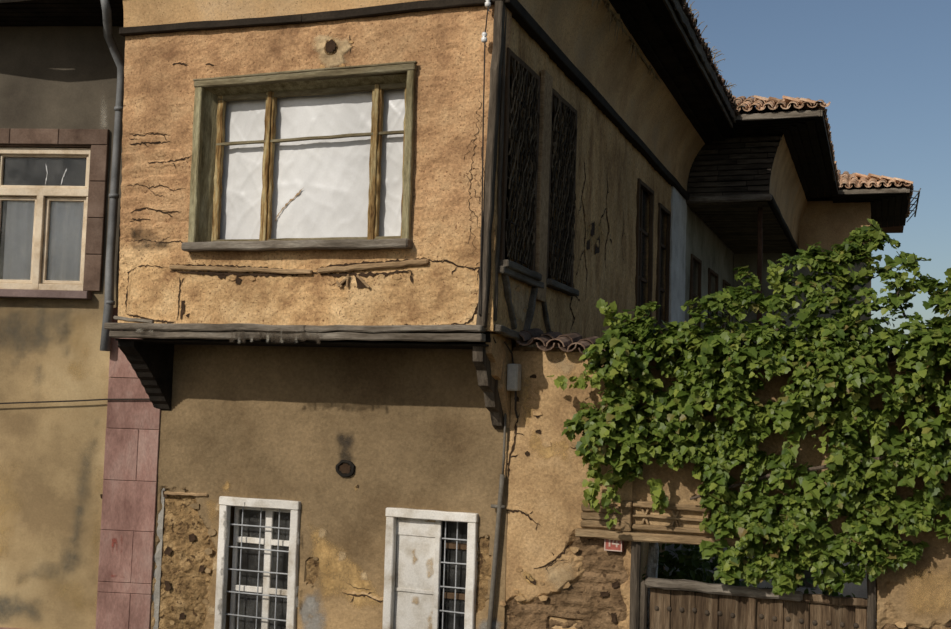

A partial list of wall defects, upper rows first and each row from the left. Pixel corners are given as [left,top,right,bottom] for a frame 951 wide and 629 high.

spalling [315,35,354,68]
crack [125,128,192,323]
spalling [169,257,429,288]
crack [570,154,626,333]
crack [504,412,524,477]
spalling [158,489,227,629]
spalling [475,535,629,629]
spalling [876,579,920,629]